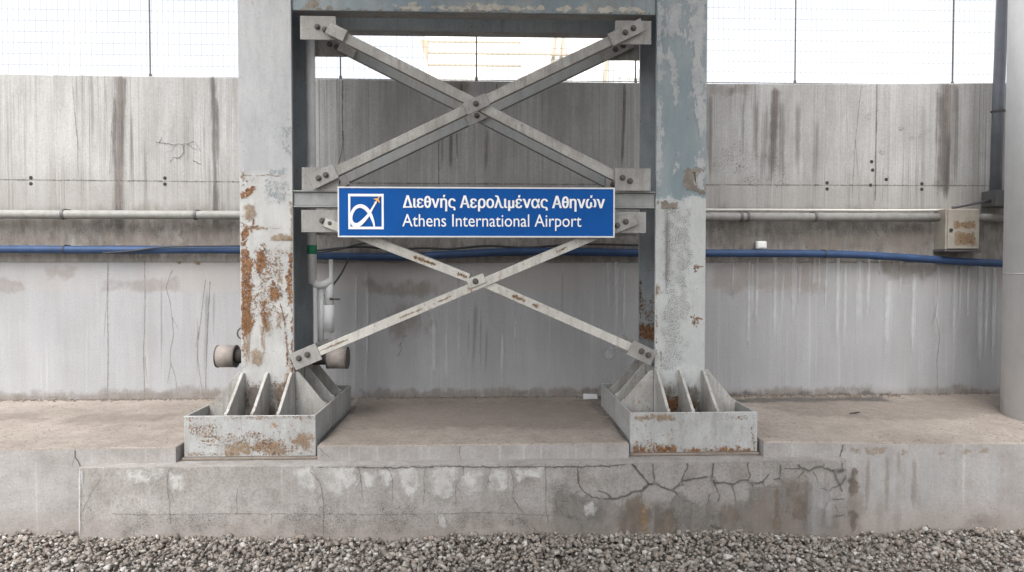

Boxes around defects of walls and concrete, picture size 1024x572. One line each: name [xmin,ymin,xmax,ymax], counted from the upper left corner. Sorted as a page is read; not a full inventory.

damp [77,77,235,245]
peeling [301,0,707,210]
damp [942,84,958,193]
rust [186,173,315,456]
rust [639,281,661,369]
damp [711,221,929,338]
damp [953,265,997,347]
crack [363,446,846,522]
rust [632,416,755,452]
damp [848,468,858,496]